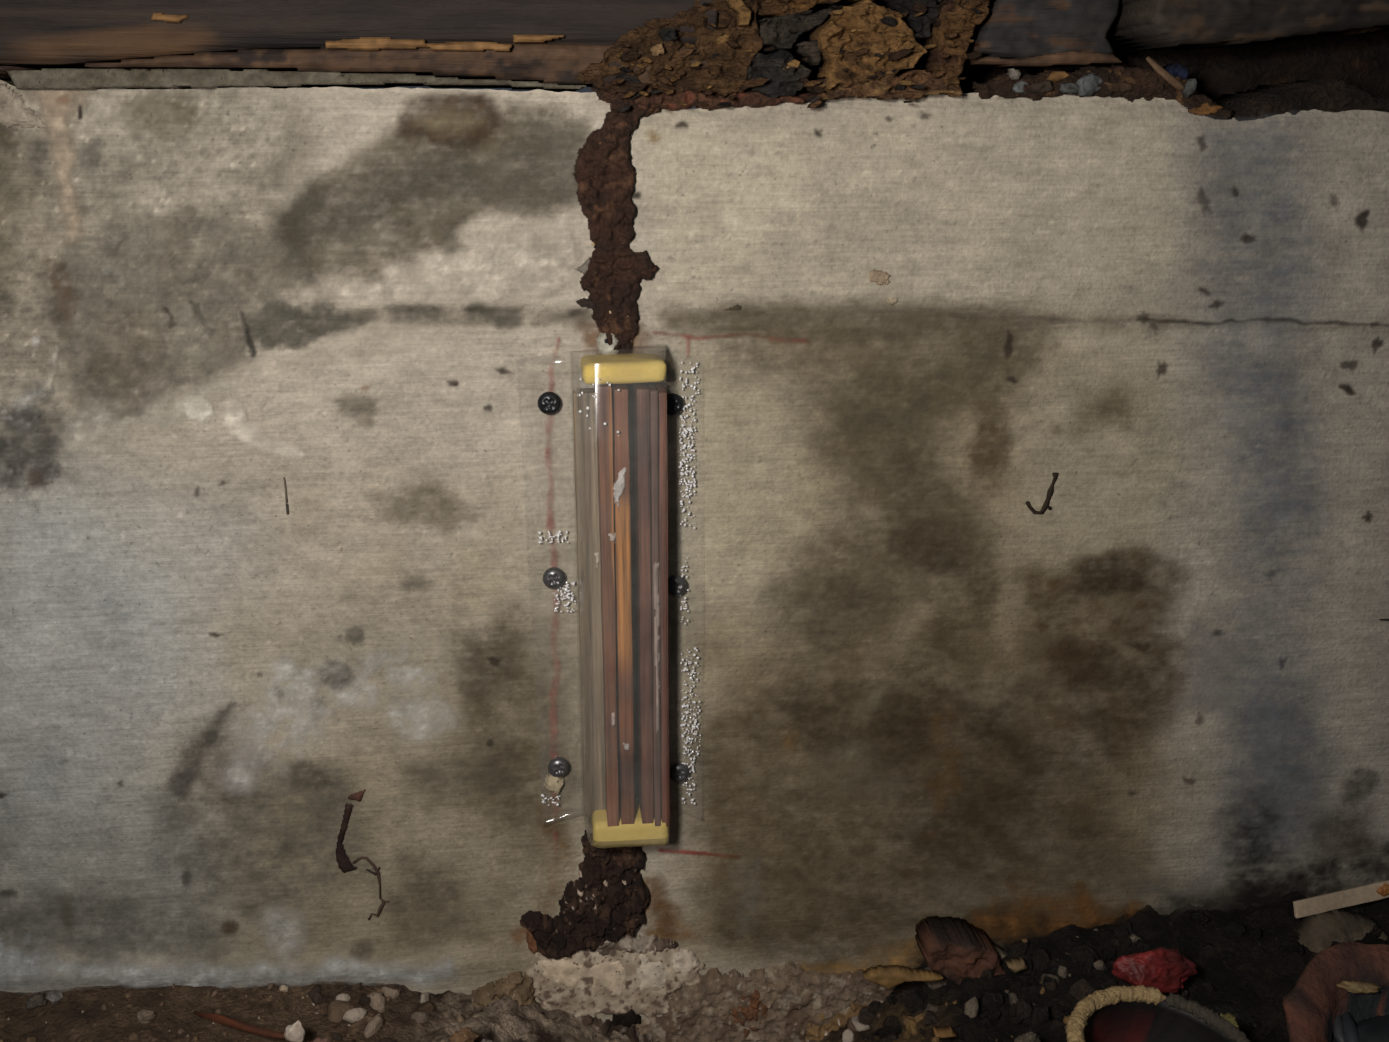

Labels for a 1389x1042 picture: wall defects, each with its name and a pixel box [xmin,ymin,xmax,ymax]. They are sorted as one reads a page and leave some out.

damp [6,68,586,361]
damp [0,345,304,485]
damp [798,314,1032,607]
damp [718,551,1173,949]
damp [1139,787,1389,917]